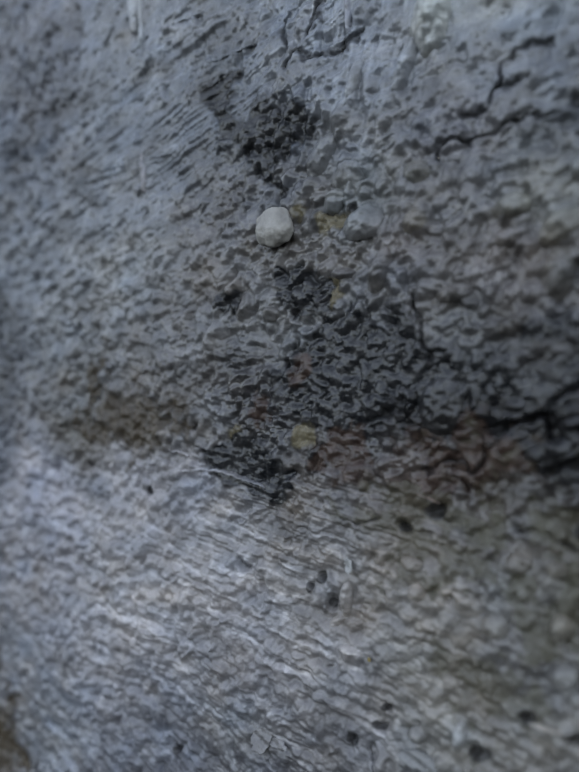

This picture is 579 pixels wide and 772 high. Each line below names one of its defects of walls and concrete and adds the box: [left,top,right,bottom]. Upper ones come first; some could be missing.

rust [307,425,373,490]
rust [392,409,536,511]